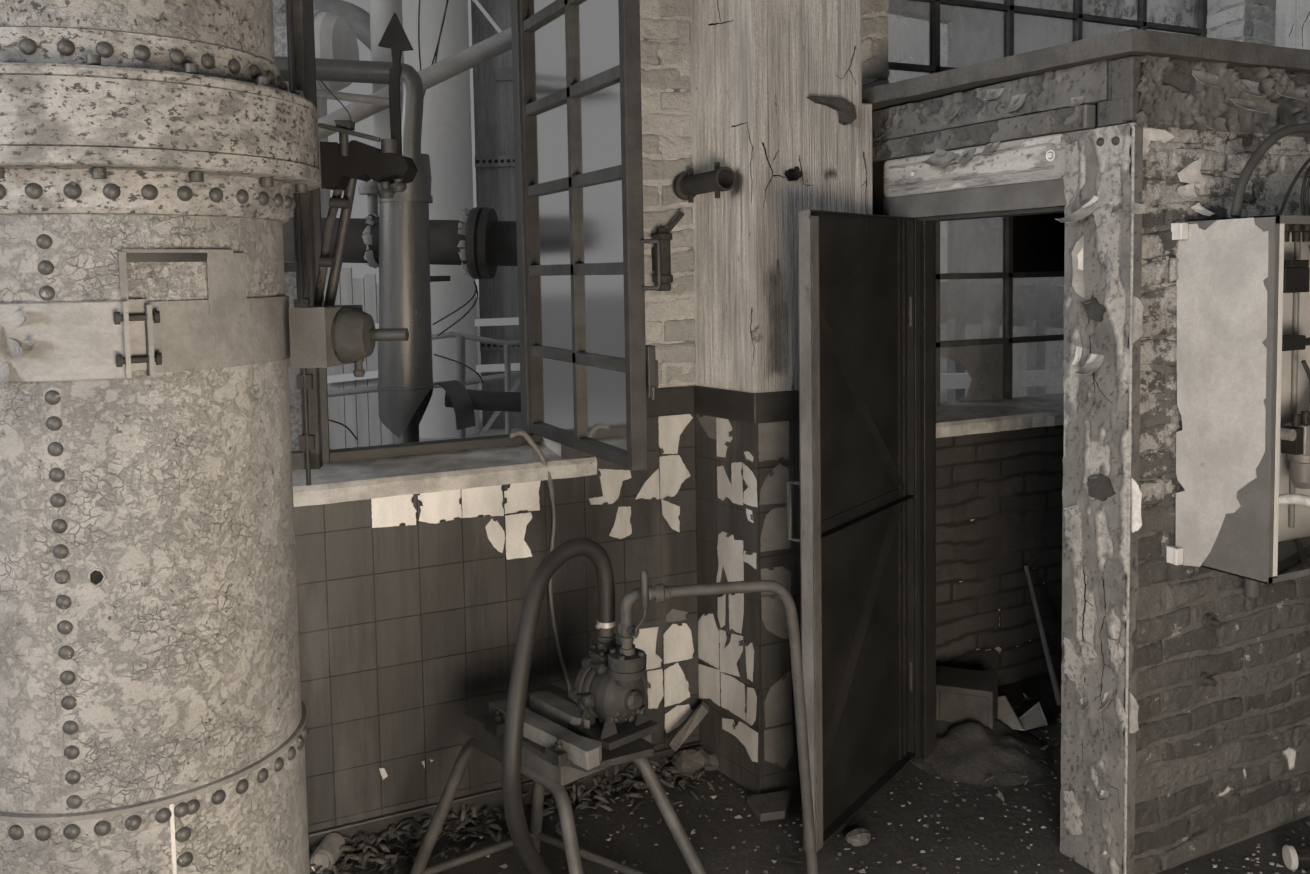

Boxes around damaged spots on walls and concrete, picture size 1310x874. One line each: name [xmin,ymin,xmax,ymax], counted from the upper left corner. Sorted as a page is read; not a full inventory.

peeling [984,88,1028,113]
peeling [1192,70,1268,113]
peeling [920,141,1000,166]
peeling [1143,127,1174,156]
peeling [1178,158,1215,216]
peeling [1072,346,1105,375]
peeling [371,481,541,560]
peeling [1063,473,1142,581]
peeling [589,414,794,768]
peeling [1063,636,1120,713]
peeling [1129,693,1139,733]
peeling [1063,790,1083,836]